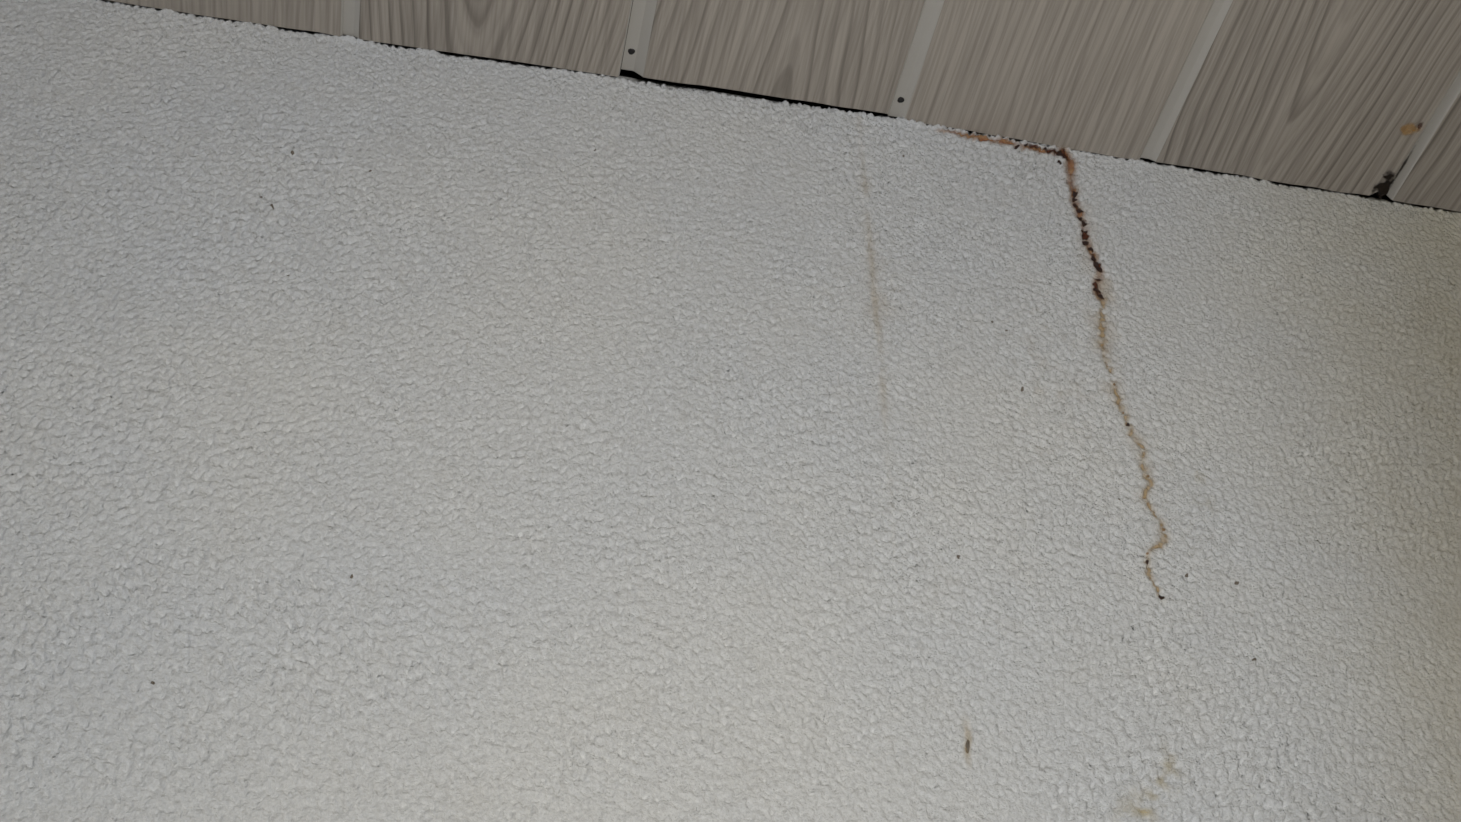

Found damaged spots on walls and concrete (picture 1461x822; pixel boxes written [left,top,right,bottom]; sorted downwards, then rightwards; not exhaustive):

crack [1056,149,1166,600]